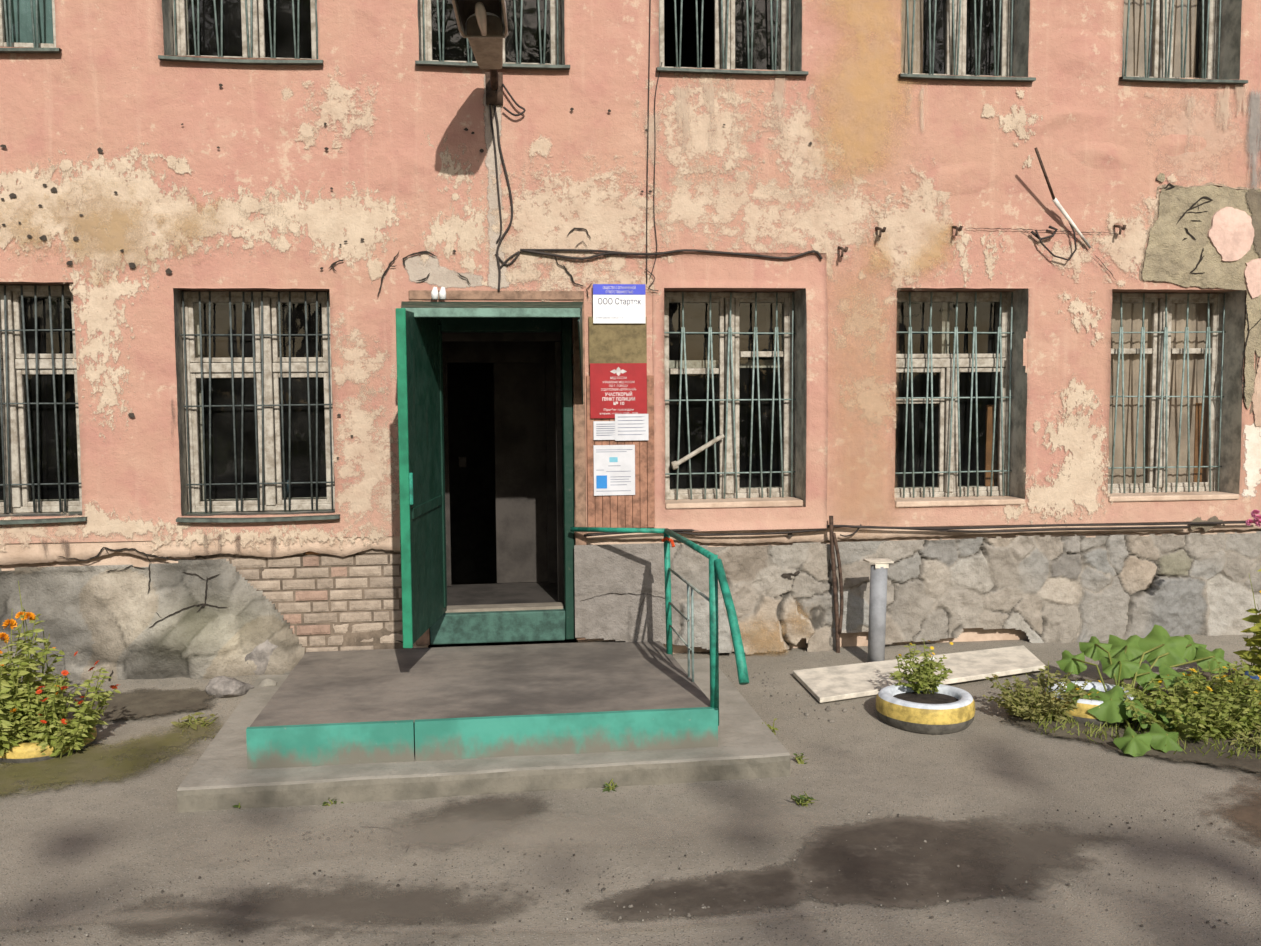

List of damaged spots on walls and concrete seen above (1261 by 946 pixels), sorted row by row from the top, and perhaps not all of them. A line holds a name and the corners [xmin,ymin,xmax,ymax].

crack [59,547,226,628]
peeling [0,142,407,438]
flaking render [0,313,407,653]
peeling [282,67,378,152]
peeling [403,73,1006,432]
peeling [1004,373,1113,524]
flaking render [1038,173,1261,498]